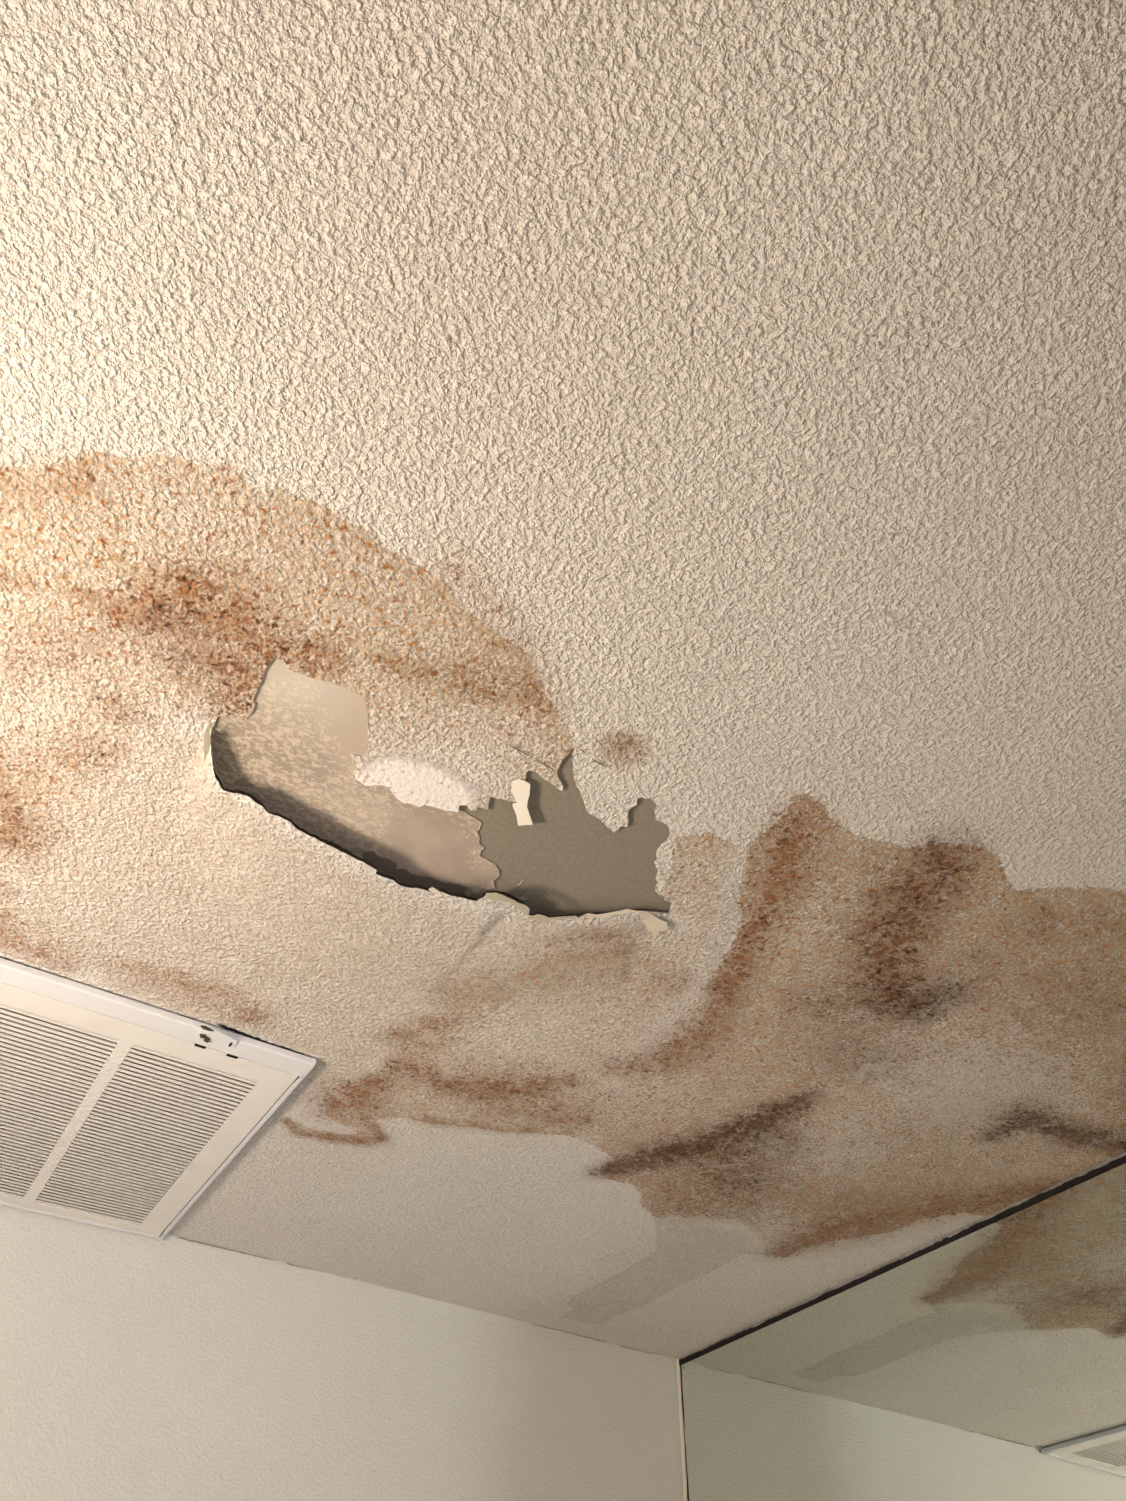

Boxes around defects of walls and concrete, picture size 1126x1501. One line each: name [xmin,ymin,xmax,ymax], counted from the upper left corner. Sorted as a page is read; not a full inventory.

leakage [0,885,66,969]
leakage [0,452,573,863]
peeling [203,657,672,936]
leakage [281,794,1126,1258]